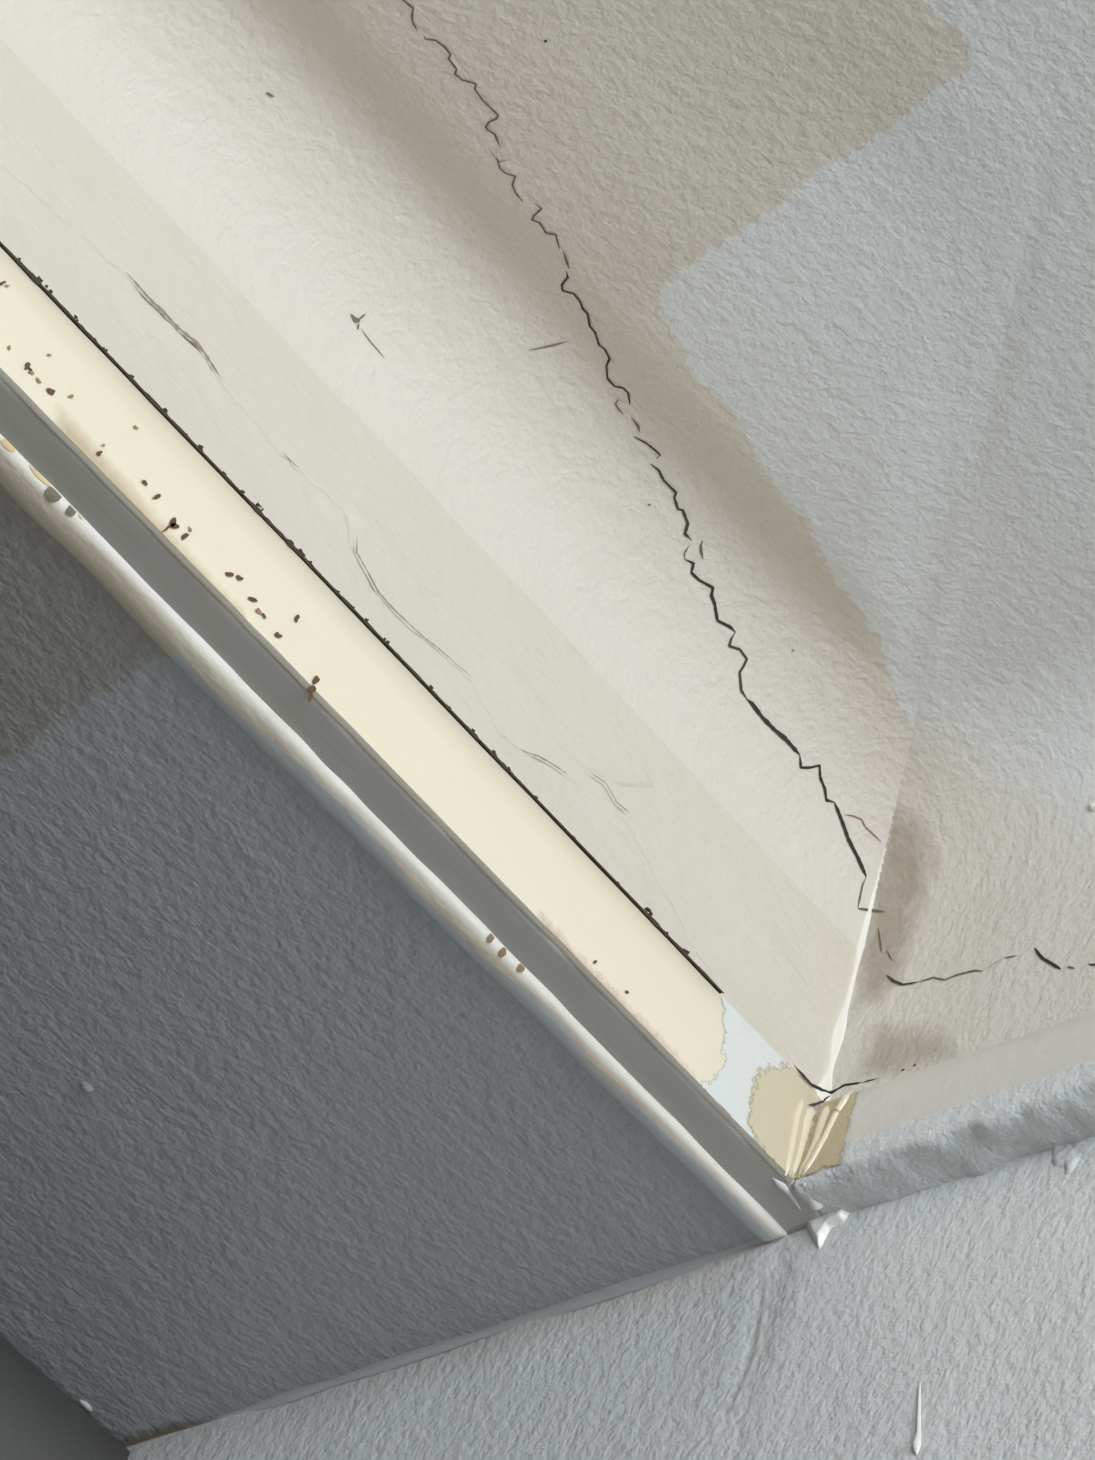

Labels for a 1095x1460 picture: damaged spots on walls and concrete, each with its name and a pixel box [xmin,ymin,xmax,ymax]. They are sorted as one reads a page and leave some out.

crack [403,0,1095,985]